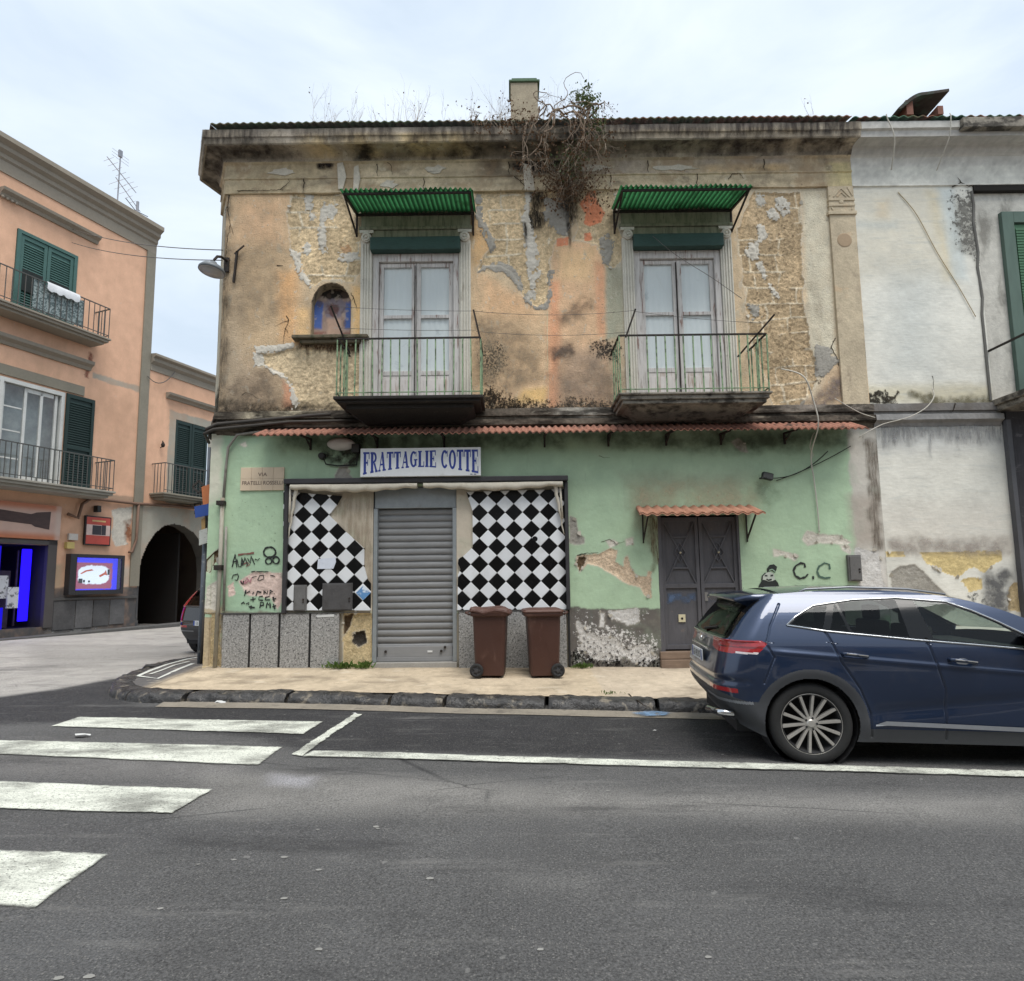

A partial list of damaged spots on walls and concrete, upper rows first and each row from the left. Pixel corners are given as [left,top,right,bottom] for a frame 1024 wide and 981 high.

flaking render [286,194,361,286]
flaking render [474,190,622,306]
water stain [948,190,980,261]
flaking render [738,190,817,405]
flaking render [259,344,359,410]
water stain [476,324,614,409]
water stain [588,339,624,368]
flaking render [341,610,372,667]
peeling [569,516,656,666]
water stain [571,610,659,667]
peeling [803,530,1003,617]
flaking render [1007,582,1020,611]